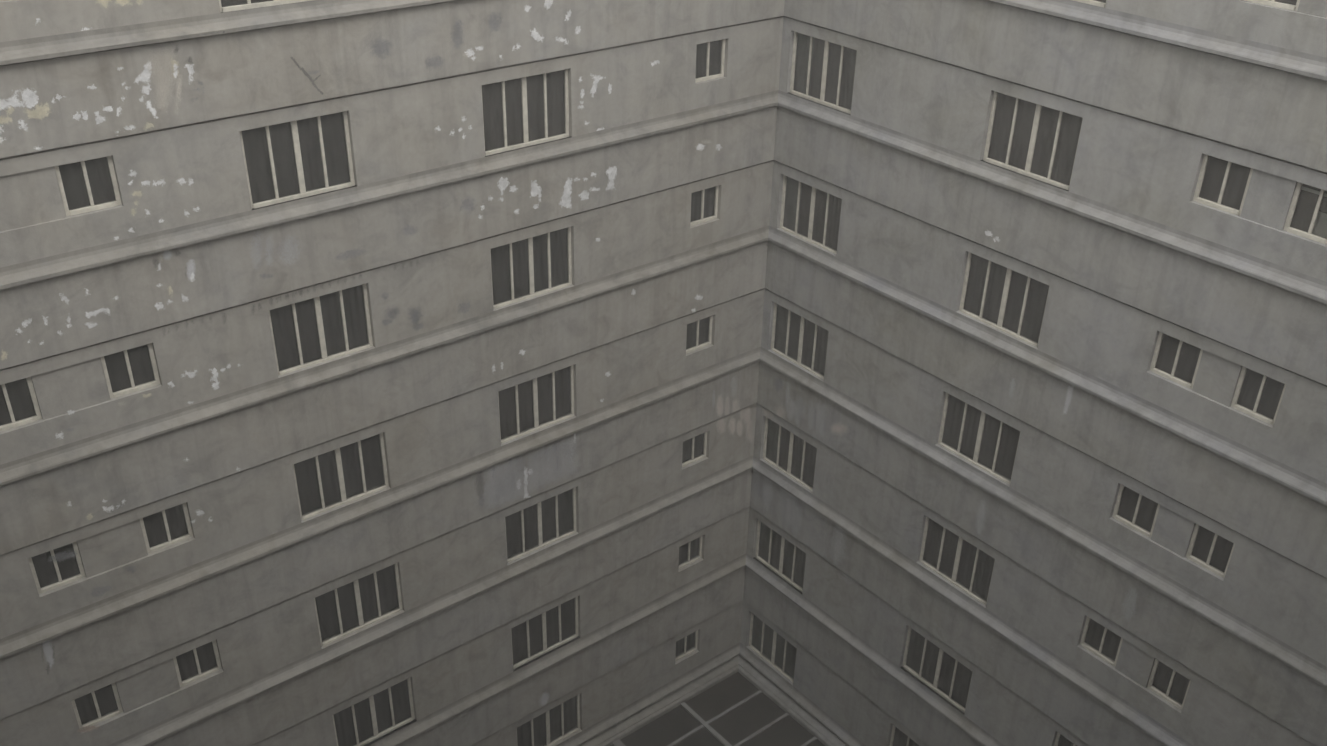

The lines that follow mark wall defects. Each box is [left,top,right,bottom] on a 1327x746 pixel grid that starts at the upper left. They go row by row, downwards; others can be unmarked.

peeling [499,9,581,61]
peeling [0,88,66,144]
peeling [71,62,158,134]
peeling [578,74,612,131]
peeling [478,177,542,219]
peeling [559,166,617,209]
peeling [155,251,195,311]
peeling [15,293,117,345]